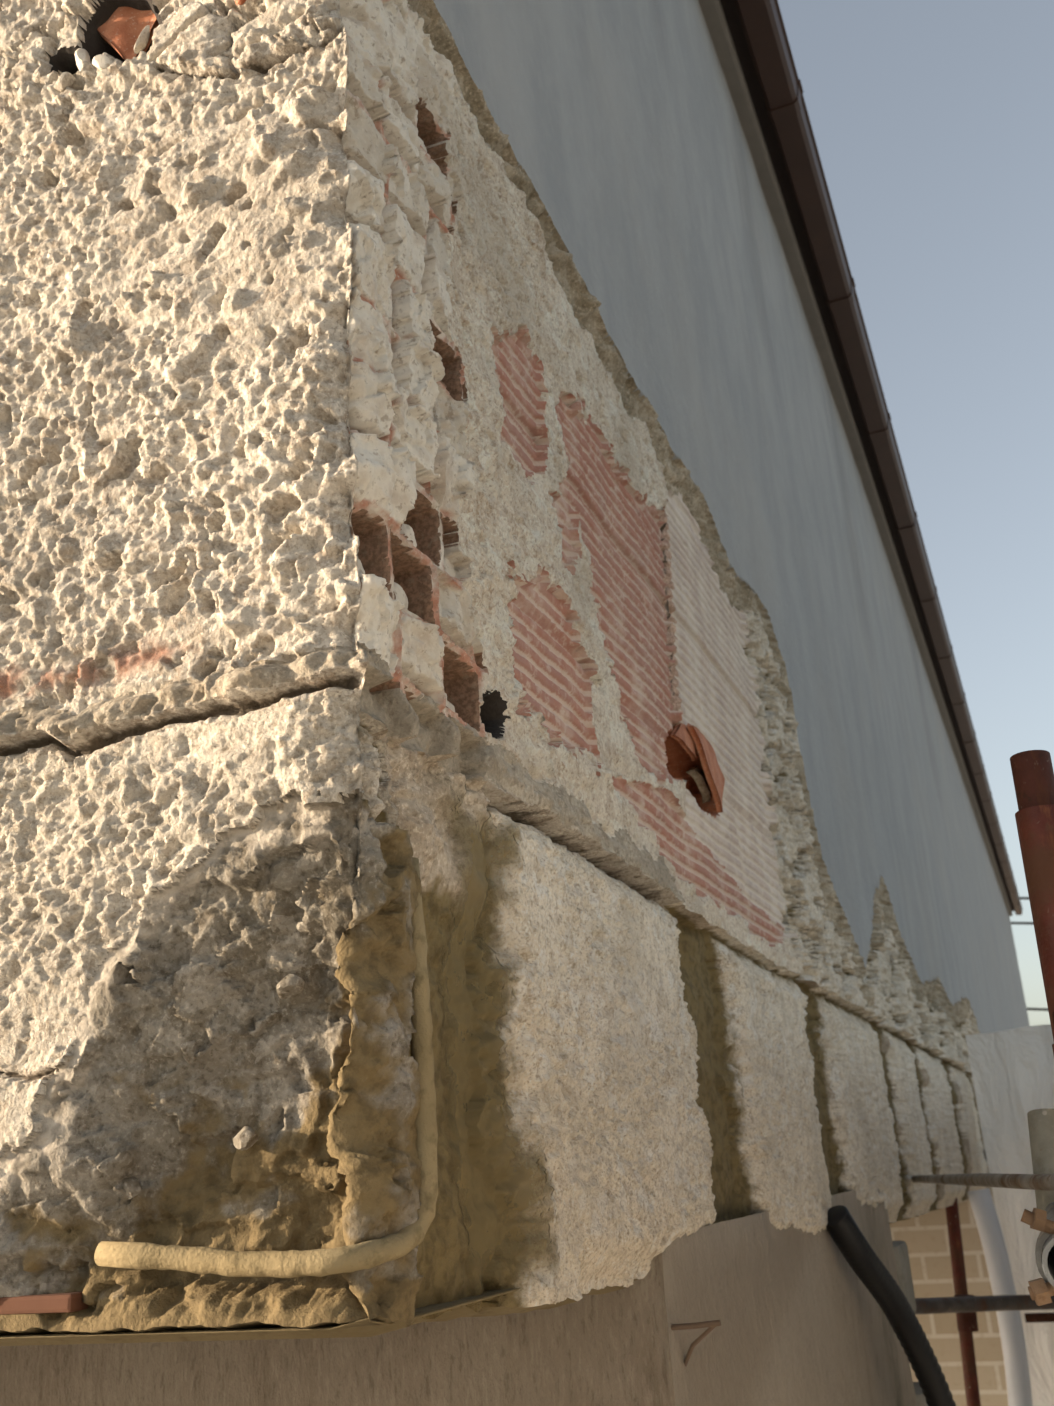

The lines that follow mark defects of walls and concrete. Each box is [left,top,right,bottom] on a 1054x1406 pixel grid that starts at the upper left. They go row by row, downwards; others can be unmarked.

spalling [54,48,113,92]
spalling [134,25,150,54]
crack [0,660,367,762]
spalling [346,287,489,737]
flaking render [407,0,980,1073]
leakage [439,806,558,1292]